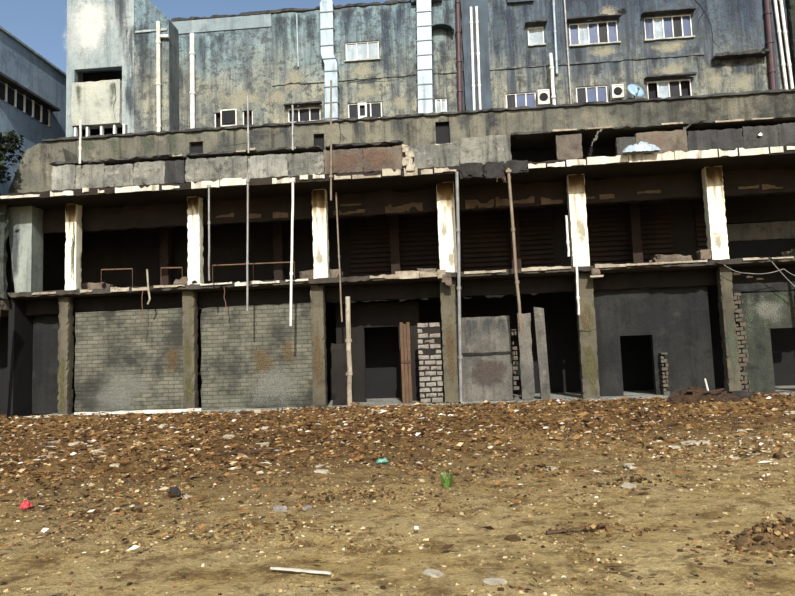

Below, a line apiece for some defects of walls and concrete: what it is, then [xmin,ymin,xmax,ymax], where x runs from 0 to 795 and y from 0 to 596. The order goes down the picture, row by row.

water stain [115,0,148,74]
water stain [381,8,401,46]
crack [695,0,719,56]
peeling [272,144,795,184]